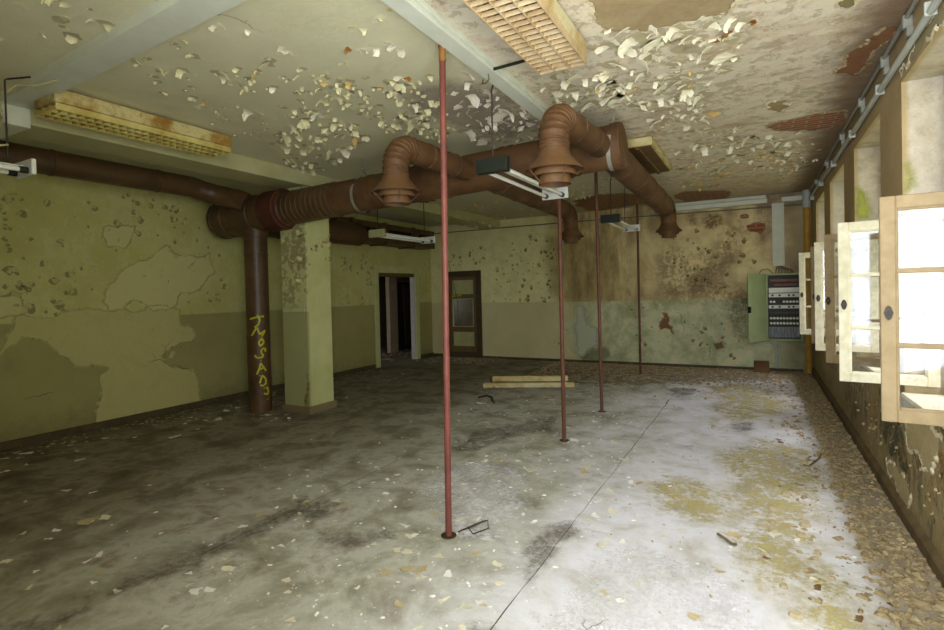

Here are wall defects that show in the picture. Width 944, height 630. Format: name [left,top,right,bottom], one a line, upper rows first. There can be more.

flaking render [833,0,860,8]
flaking render [832,26,897,76]
flaking render [535,0,848,203]
flaking render [563,176,645,211]
peeling [0,192,220,422]
damp [575,306,597,356]
flaking render [629,306,708,355]
damp [879,390,909,474]